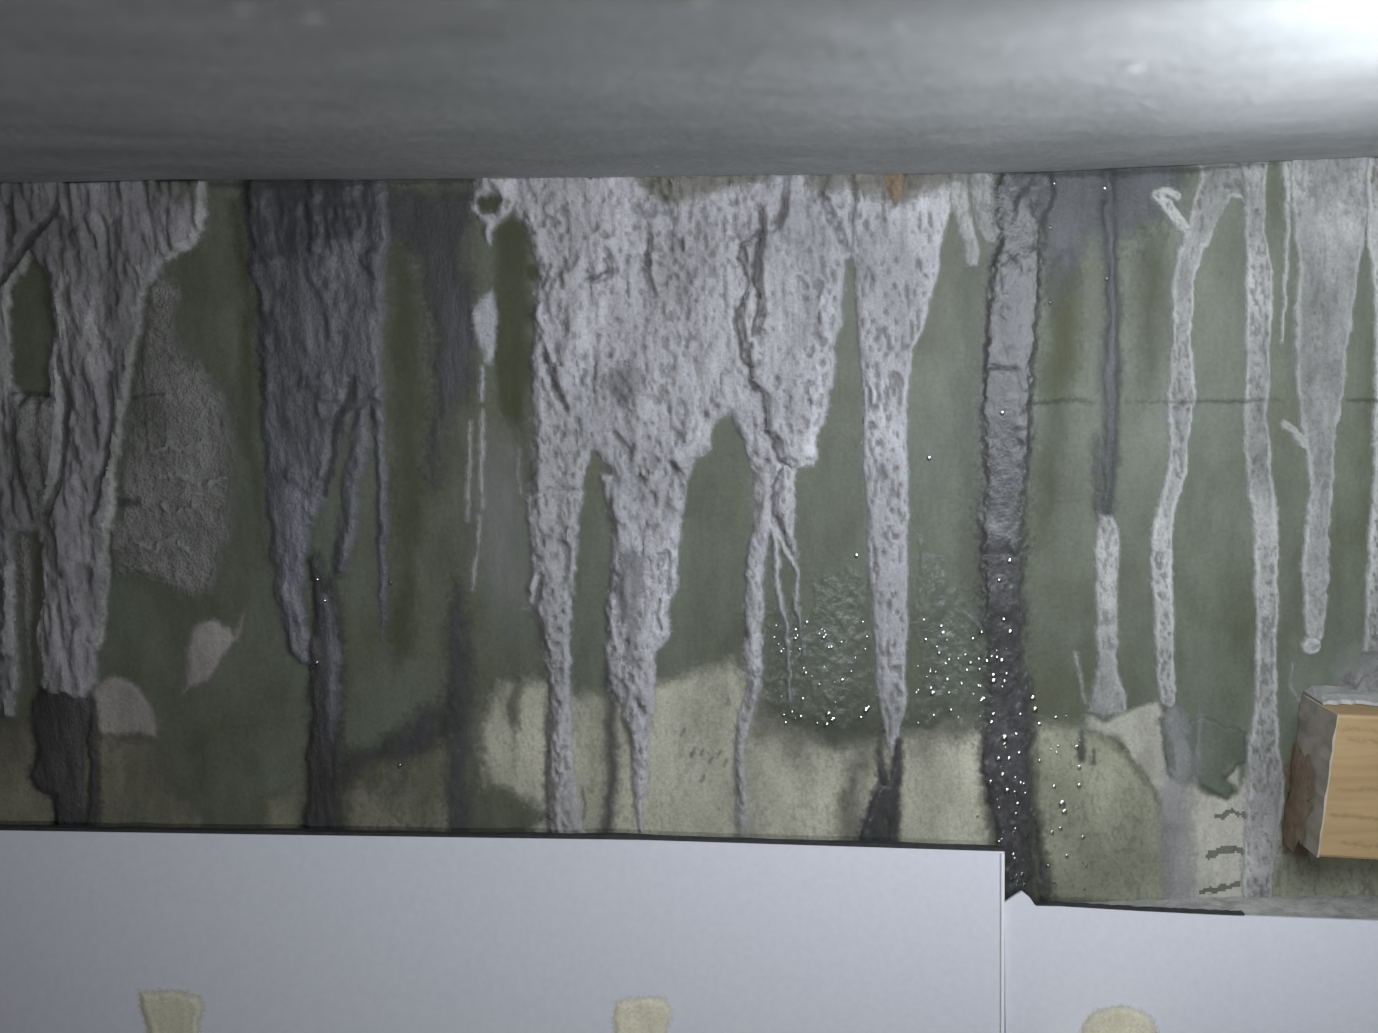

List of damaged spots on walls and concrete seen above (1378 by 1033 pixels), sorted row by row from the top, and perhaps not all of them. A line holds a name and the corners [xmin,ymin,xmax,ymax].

damp [0,180,208,826]
crack [735,218,792,552]
damp [246,157,1378,902]